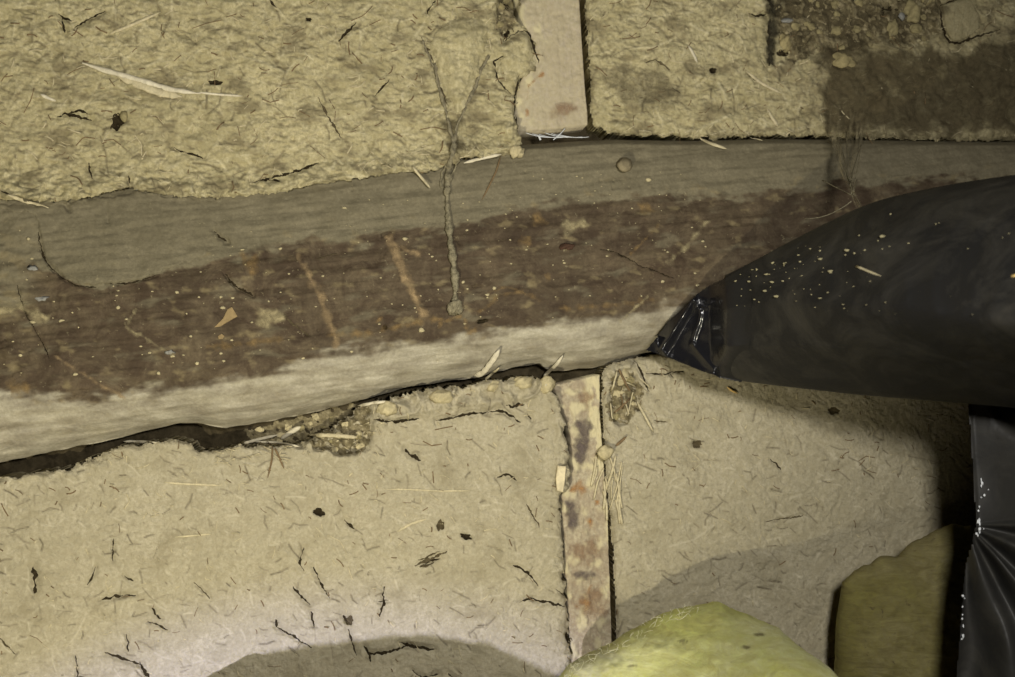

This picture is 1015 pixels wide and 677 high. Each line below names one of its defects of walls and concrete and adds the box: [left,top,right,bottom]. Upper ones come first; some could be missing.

spalling [775,0,941,66]
crack [374,402,531,424]
crack [405,449,421,461]